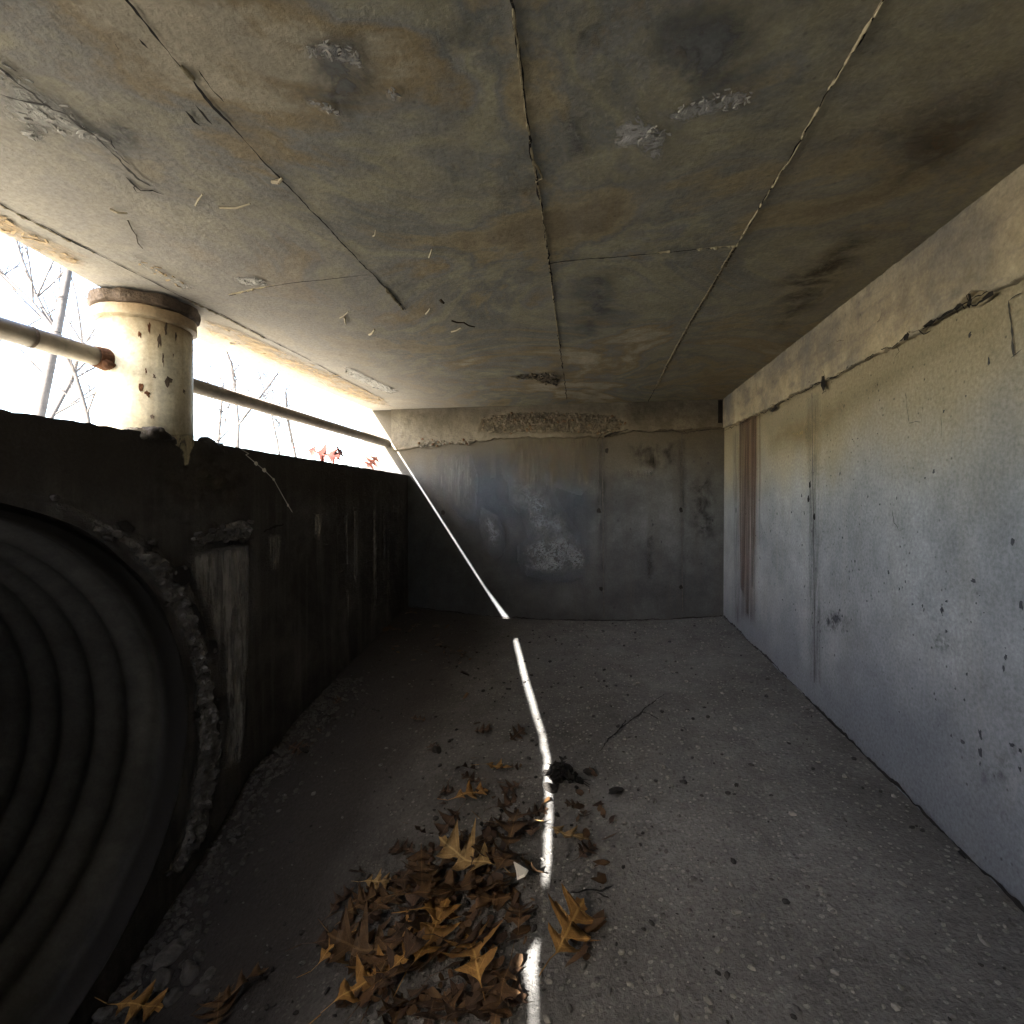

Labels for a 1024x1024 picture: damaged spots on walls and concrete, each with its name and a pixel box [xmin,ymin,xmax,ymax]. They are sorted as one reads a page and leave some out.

peeling [306,39,363,68]
crack [110,139,161,194]
peeling [617,117,672,157]
rust [138,322,177,398]
spalling [516,372,560,386]
crack [596,280,1014,443]
spalling [417,411,626,448]
leakage [445,459,583,578]
rust [740,416,756,613]
spalling [49,495,255,877]